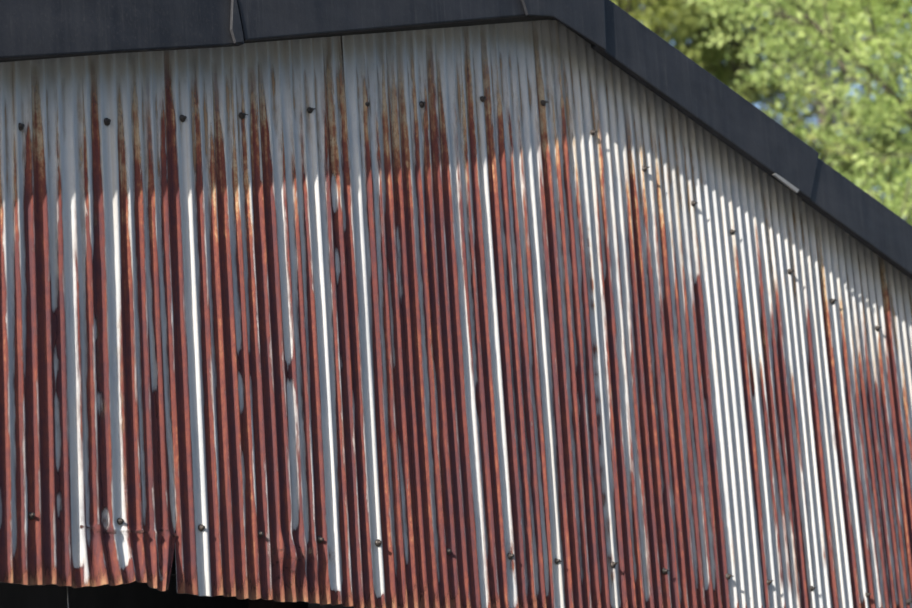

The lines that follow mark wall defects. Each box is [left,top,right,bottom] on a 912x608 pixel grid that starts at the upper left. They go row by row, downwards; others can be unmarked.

rust [0,68,199,596]
rust [194,47,839,608]
rust [820,251,912,608]